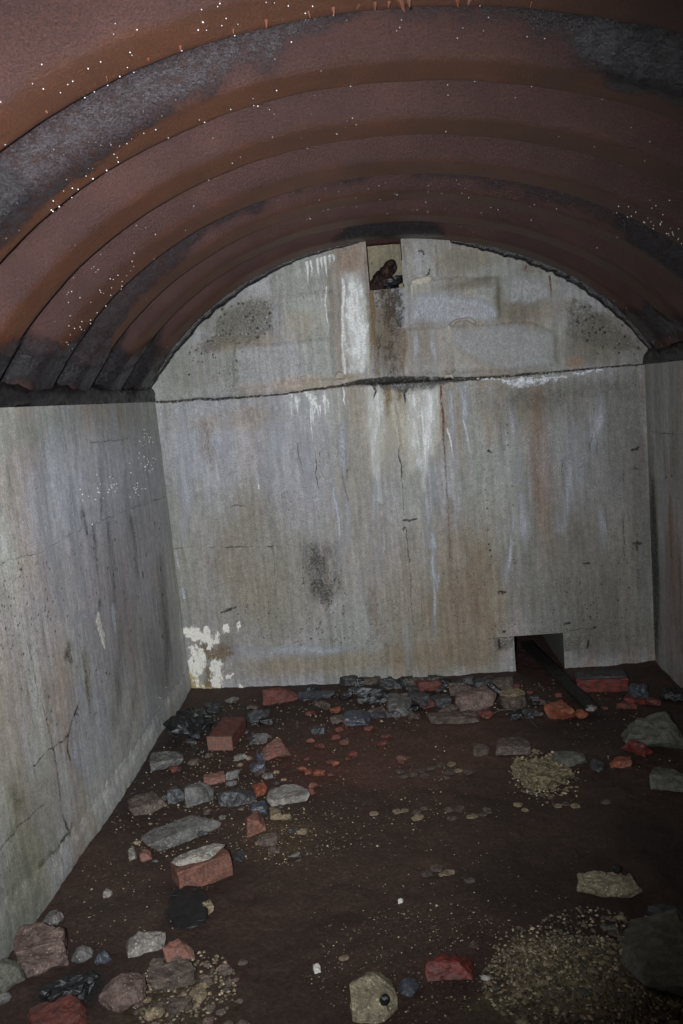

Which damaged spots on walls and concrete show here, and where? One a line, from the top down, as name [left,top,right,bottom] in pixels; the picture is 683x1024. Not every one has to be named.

rust [369,291,377,373]
crack [156,364,644,561]
leakage [305,221,604,616]